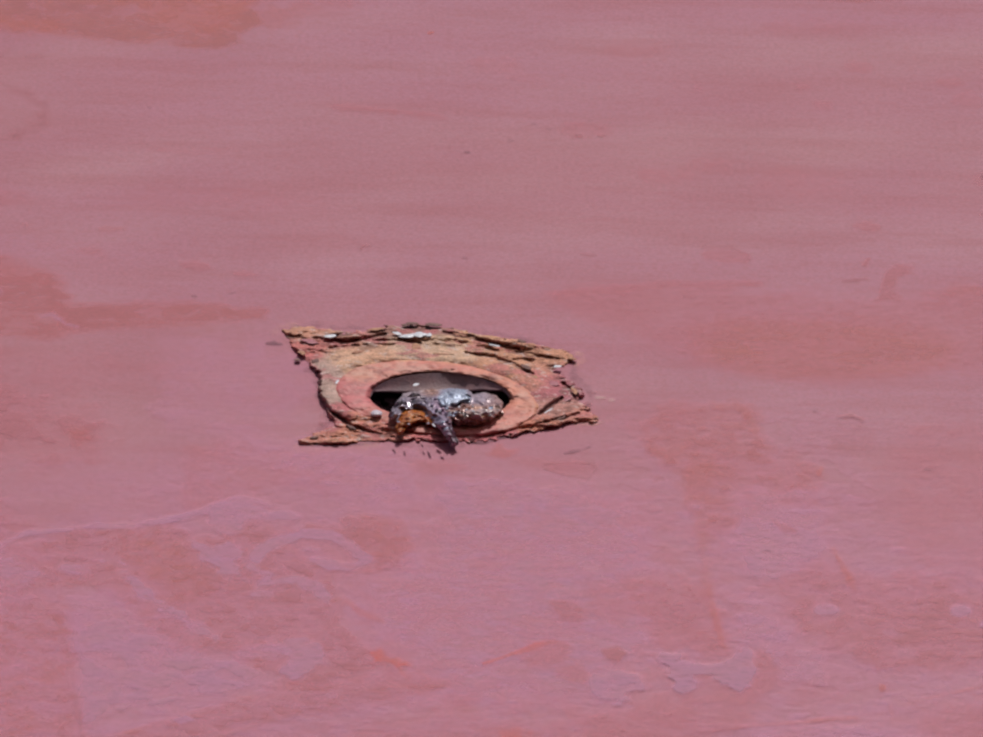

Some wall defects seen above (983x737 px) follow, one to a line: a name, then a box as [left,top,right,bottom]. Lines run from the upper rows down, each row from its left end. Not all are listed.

spalling [281,322,599,447]